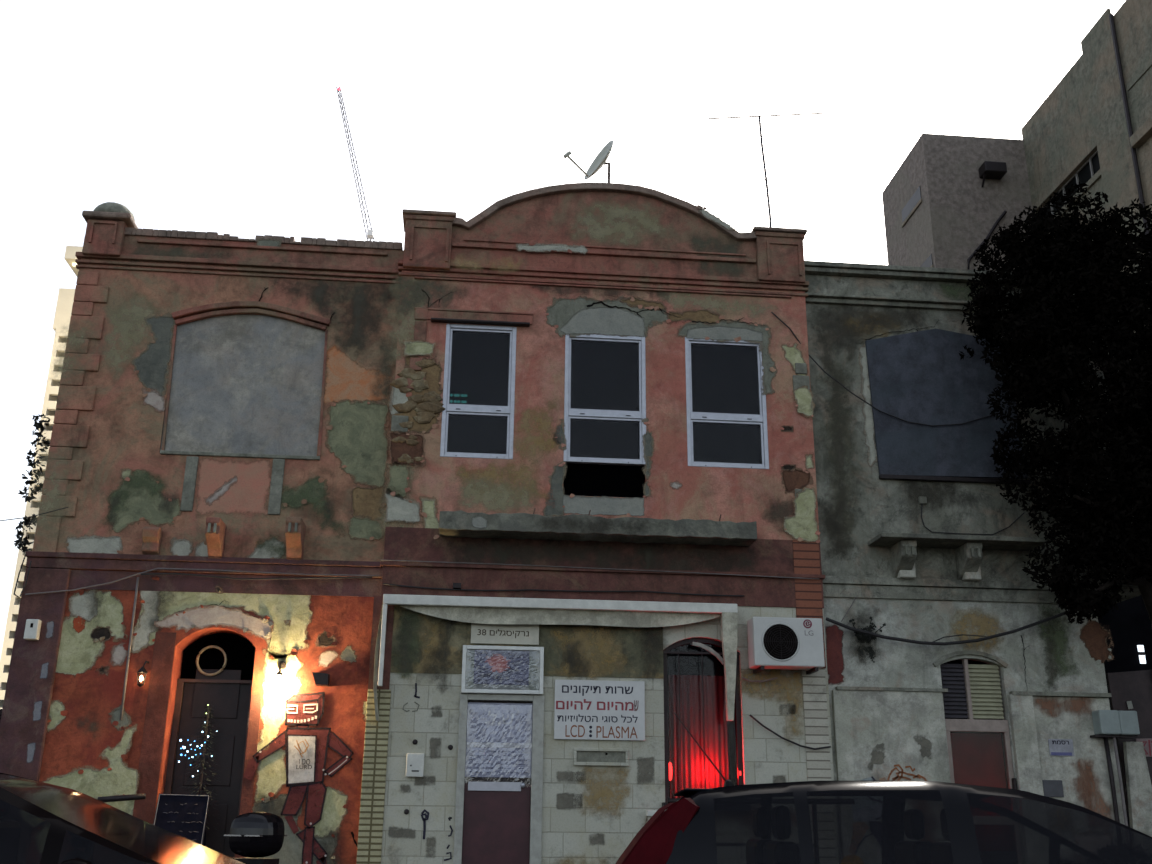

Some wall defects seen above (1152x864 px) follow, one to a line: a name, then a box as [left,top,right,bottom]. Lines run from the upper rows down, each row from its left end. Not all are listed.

flaking render [131,313,175,413]
flaking render [545,295,815,418]
flaking render [64,468,208,557]
peeling [196,458,328,515]
peeling [247,538,285,559]
flaking render [324,339,445,539]
flaking render [533,418,654,517]
flaking render [780,452,820,543]
peeling [27,743,36,763]
peeling [33,700,68,732]
flaking render [40,576,357,864]
corrosion [1076,760,1111,819]